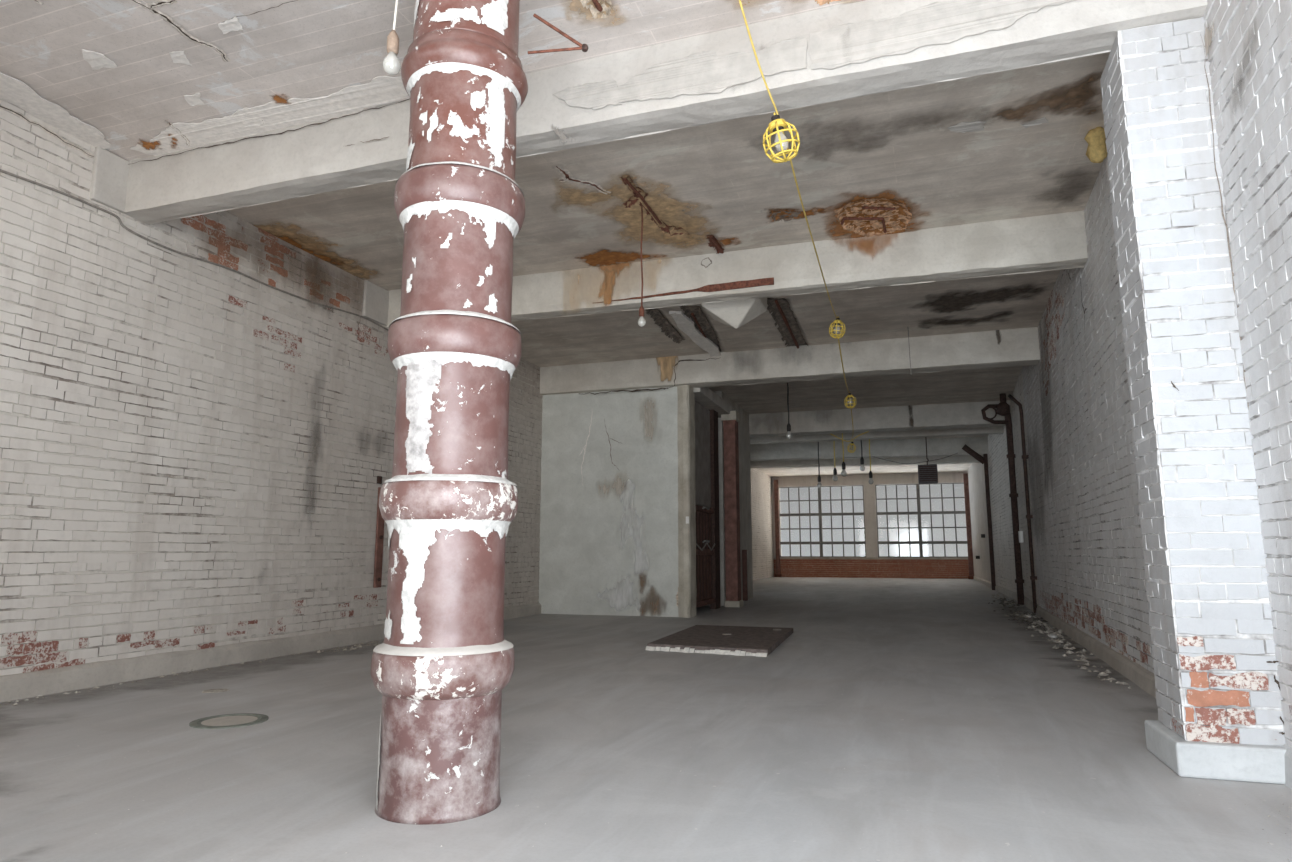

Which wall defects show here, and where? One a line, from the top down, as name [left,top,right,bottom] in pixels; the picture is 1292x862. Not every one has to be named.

crack [131,0,298,62]
peeling [553,0,1075,110]
crack [0,104,94,159]
crack [133,99,409,164]
flaking render [181,215,296,287]
corrosion [559,175,739,305]
spalling [621,176,689,236]
spalling [706,234,725,254]
spalling [835,198,912,237]
flaking render [304,279,389,358]
flaking render [1177,636,1269,744]